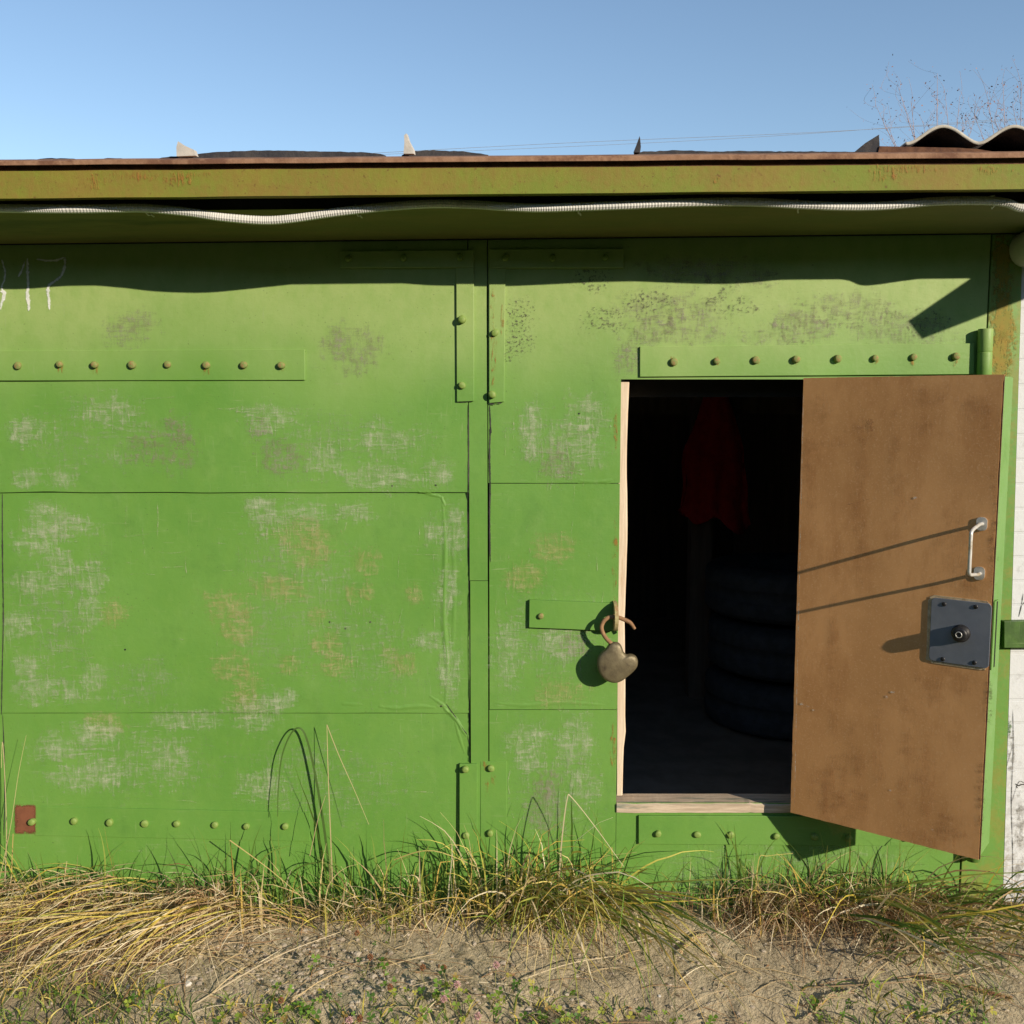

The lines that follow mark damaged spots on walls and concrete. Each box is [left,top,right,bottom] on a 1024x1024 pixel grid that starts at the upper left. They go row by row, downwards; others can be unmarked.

corrosion [990,235,1017,376]
peeling [40,715,121,788]